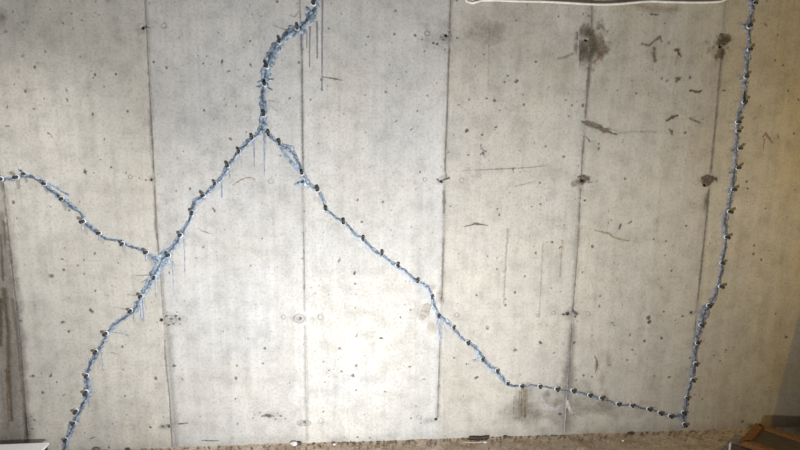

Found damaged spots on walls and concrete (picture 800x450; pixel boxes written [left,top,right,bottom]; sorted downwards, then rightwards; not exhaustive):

crack [0,0,554,450]
water stain [577,28,607,62]
crack [559,0,755,428]